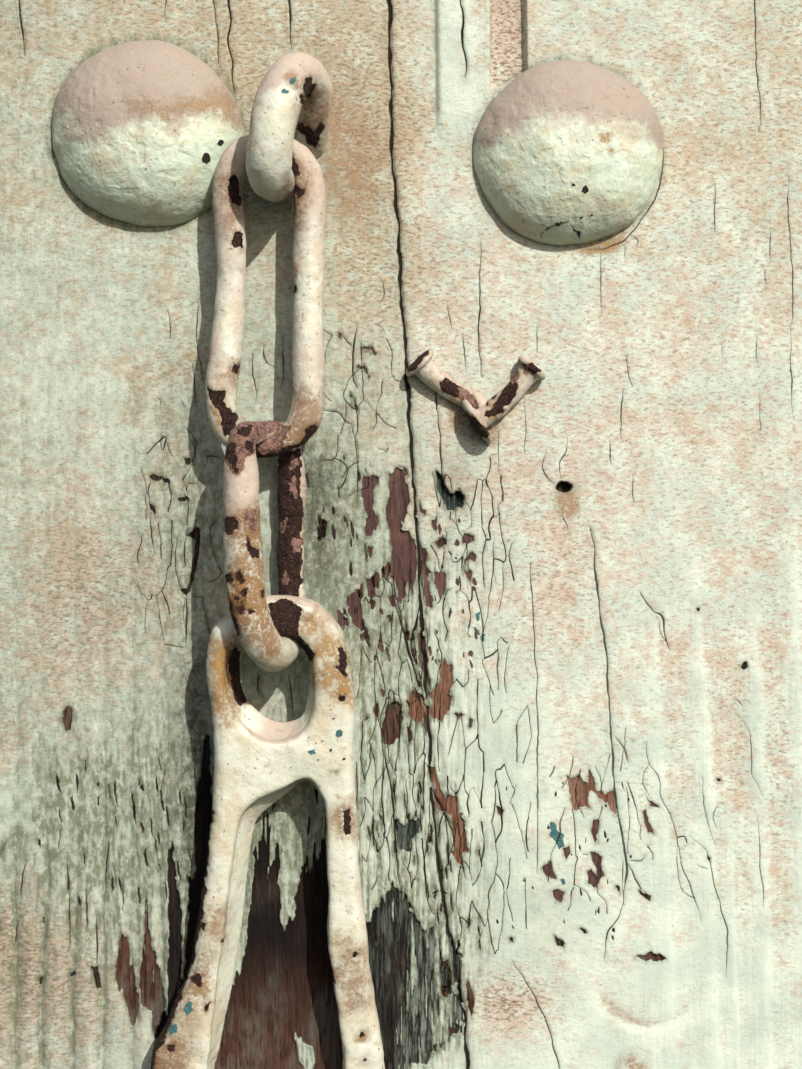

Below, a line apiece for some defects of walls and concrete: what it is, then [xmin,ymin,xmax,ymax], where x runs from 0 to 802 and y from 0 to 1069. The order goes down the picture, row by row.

rust [407,350,429,372]
rust [440,362,541,443]
peeling [180,520,204,599]
peeling [310,466,477,745]
crack [321,0,728,1069]
peeling [112,887,166,1038]
peeling [131,757,193,920]
peeling [214,788,343,1069]
peeling [367,762,481,879]
peeling [441,959,475,1037]
peeling [539,861,565,904]
peeling [555,769,630,896]